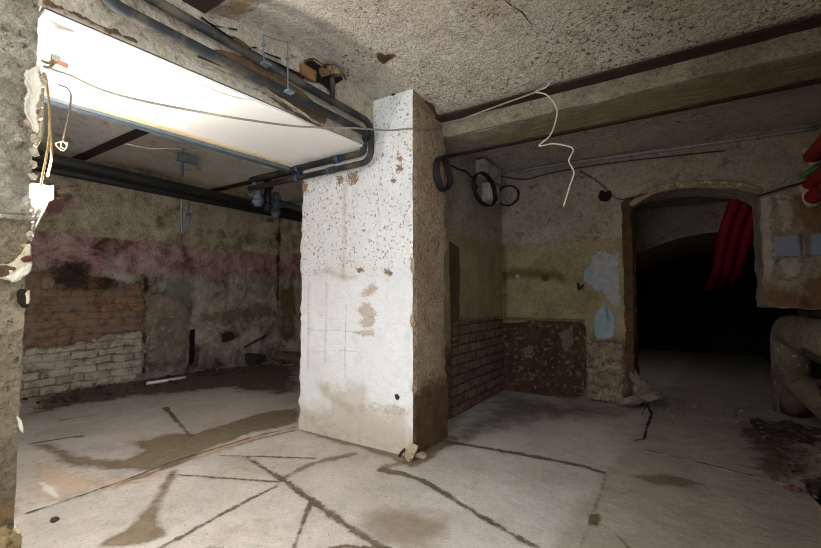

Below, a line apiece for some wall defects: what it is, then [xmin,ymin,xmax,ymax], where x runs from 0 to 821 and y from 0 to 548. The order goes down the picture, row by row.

flaking render [0,244,146,399]
leakage [50,262,118,291]
spalling [449,179,805,418]
spalling [0,525,22,548]
leakage [38,409,297,546]
crack [25,407,391,548]
crack [377,457,536,547]
crack [441,440,606,474]
crack [634,402,786,485]